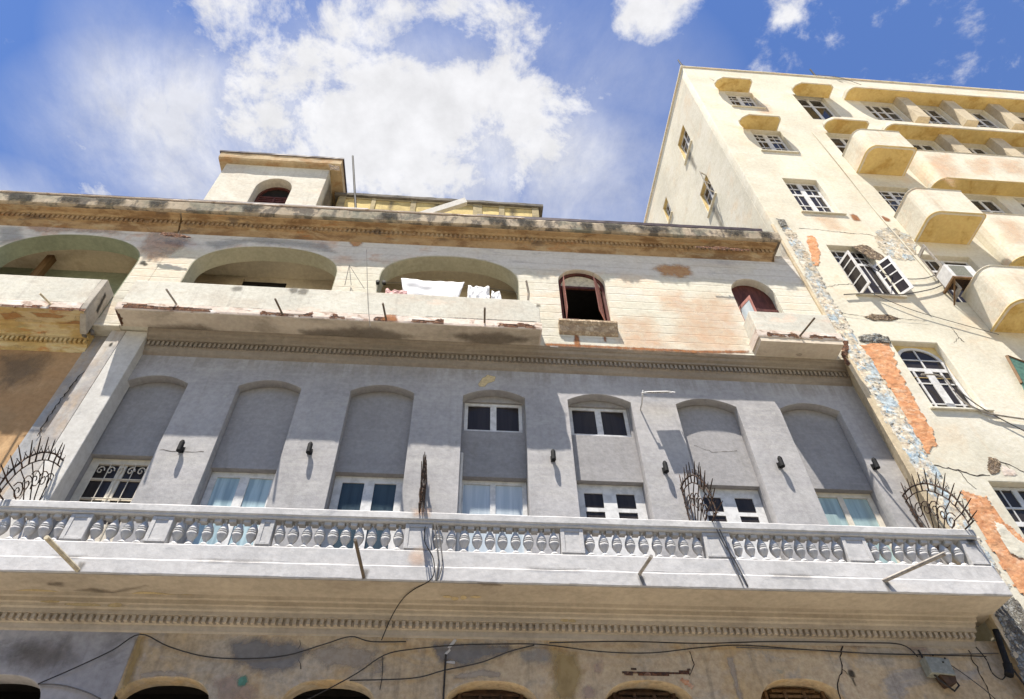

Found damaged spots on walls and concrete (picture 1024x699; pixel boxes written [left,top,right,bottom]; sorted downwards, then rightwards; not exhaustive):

spalling [767,218,1024,681]